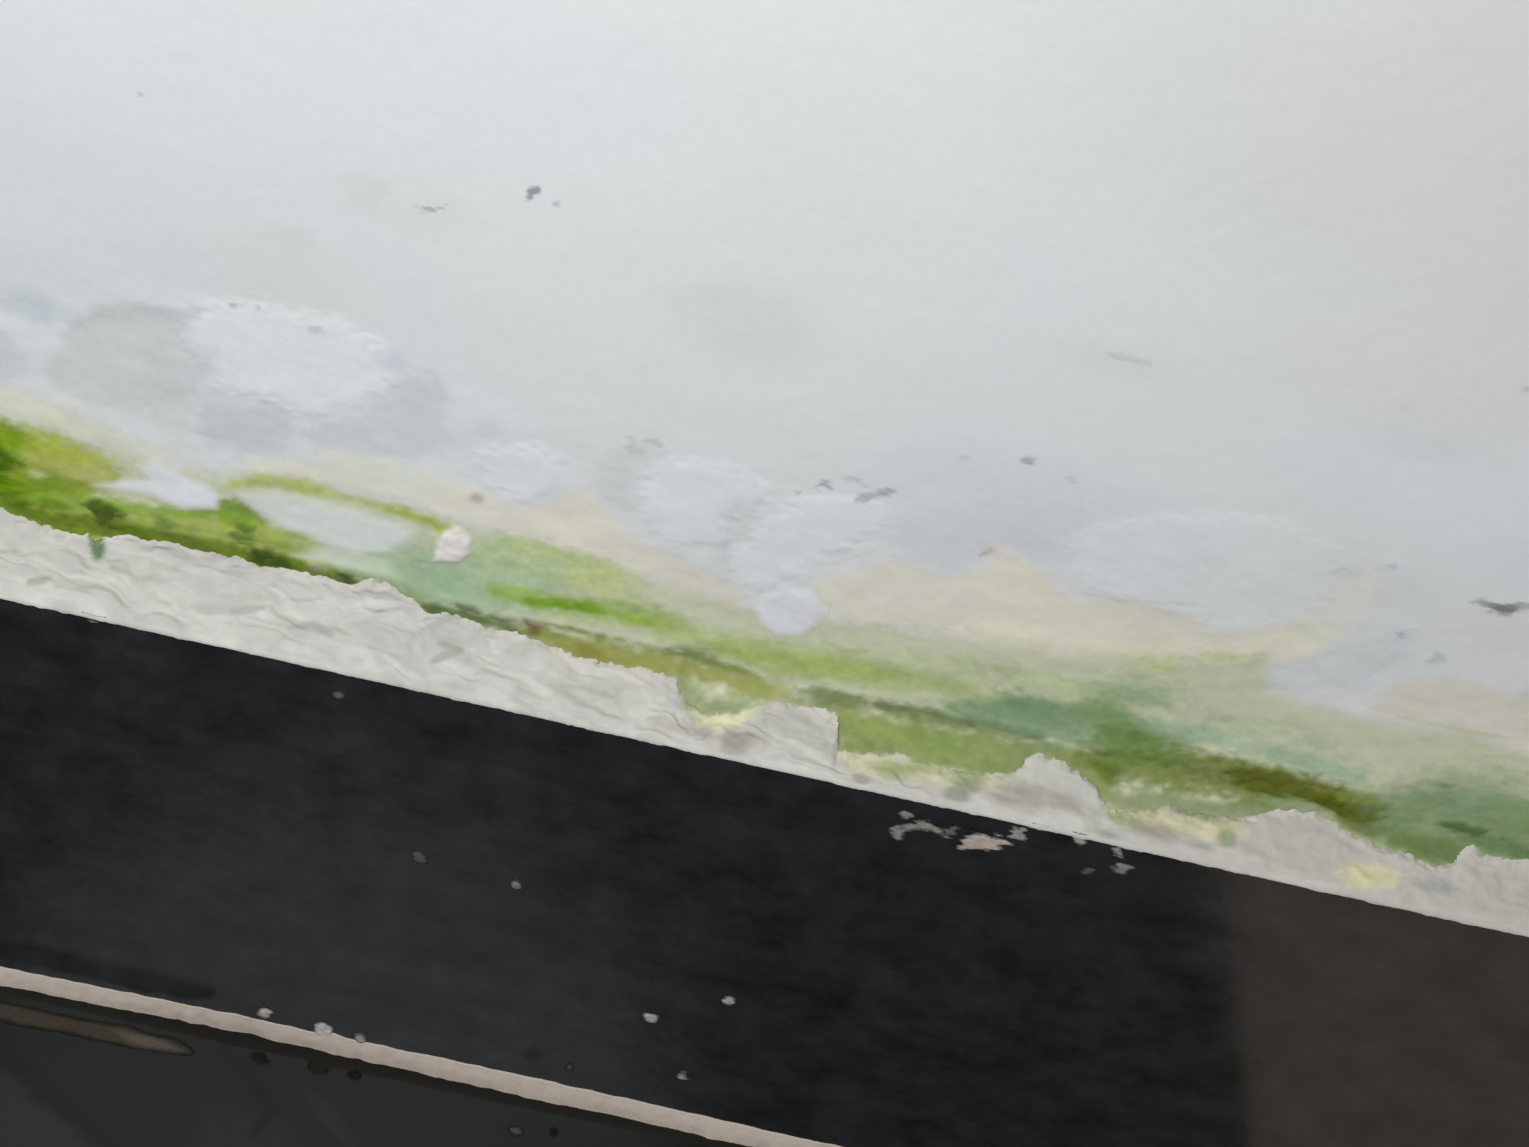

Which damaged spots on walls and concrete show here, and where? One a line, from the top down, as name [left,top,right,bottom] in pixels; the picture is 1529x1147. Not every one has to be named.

leakage [0,276,519,534]
leakage [585,426,672,524]
leakage [0,487,269,568]
leakage [492,530,619,567]
leakage [699,491,780,573]
peeling [751,584,831,639]
leakage [449,577,1077,729]
spalling [644,711,772,758]
leakage [1143,706,1378,781]
spalling [937,773,1215,854]
leakage [1107,783,1341,822]
leakage [1373,824,1529,866]